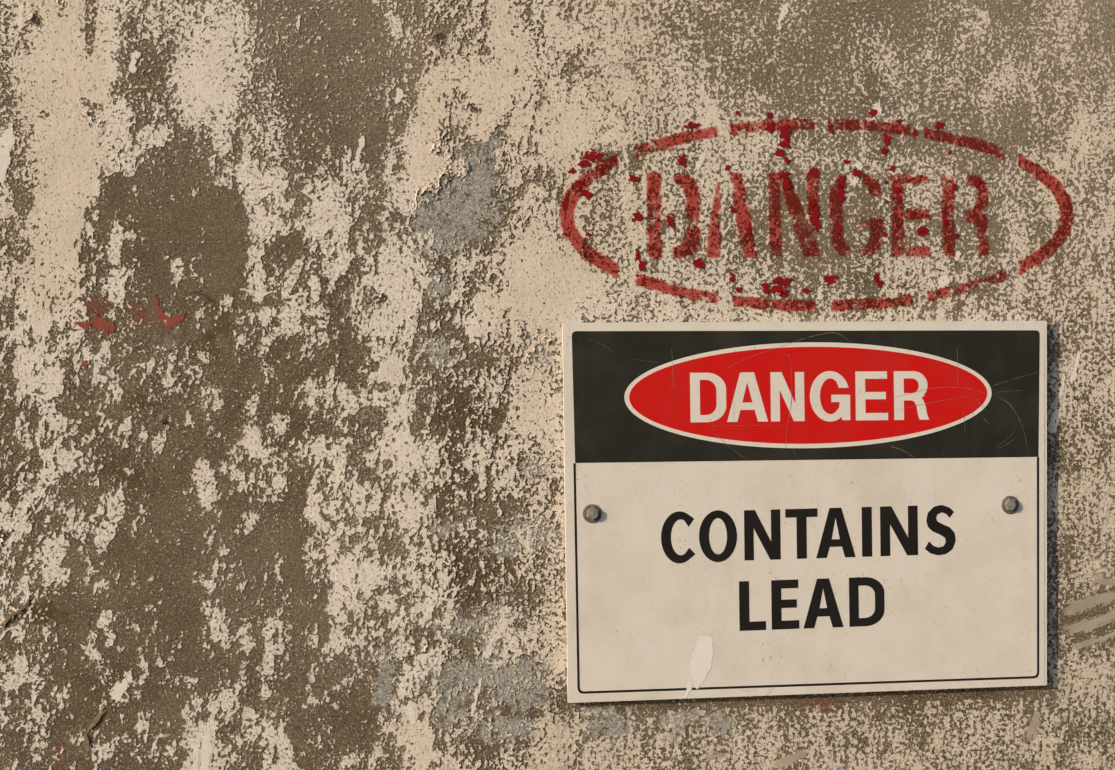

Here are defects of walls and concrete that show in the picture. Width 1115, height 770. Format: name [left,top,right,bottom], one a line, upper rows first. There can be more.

peeling [299,108,351,138]
peeling [152,252,211,334]
peeling [201,525,216,554]
peeling [91,559,120,614]
peeling [443,675,476,713]
peeling [307,718,332,749]